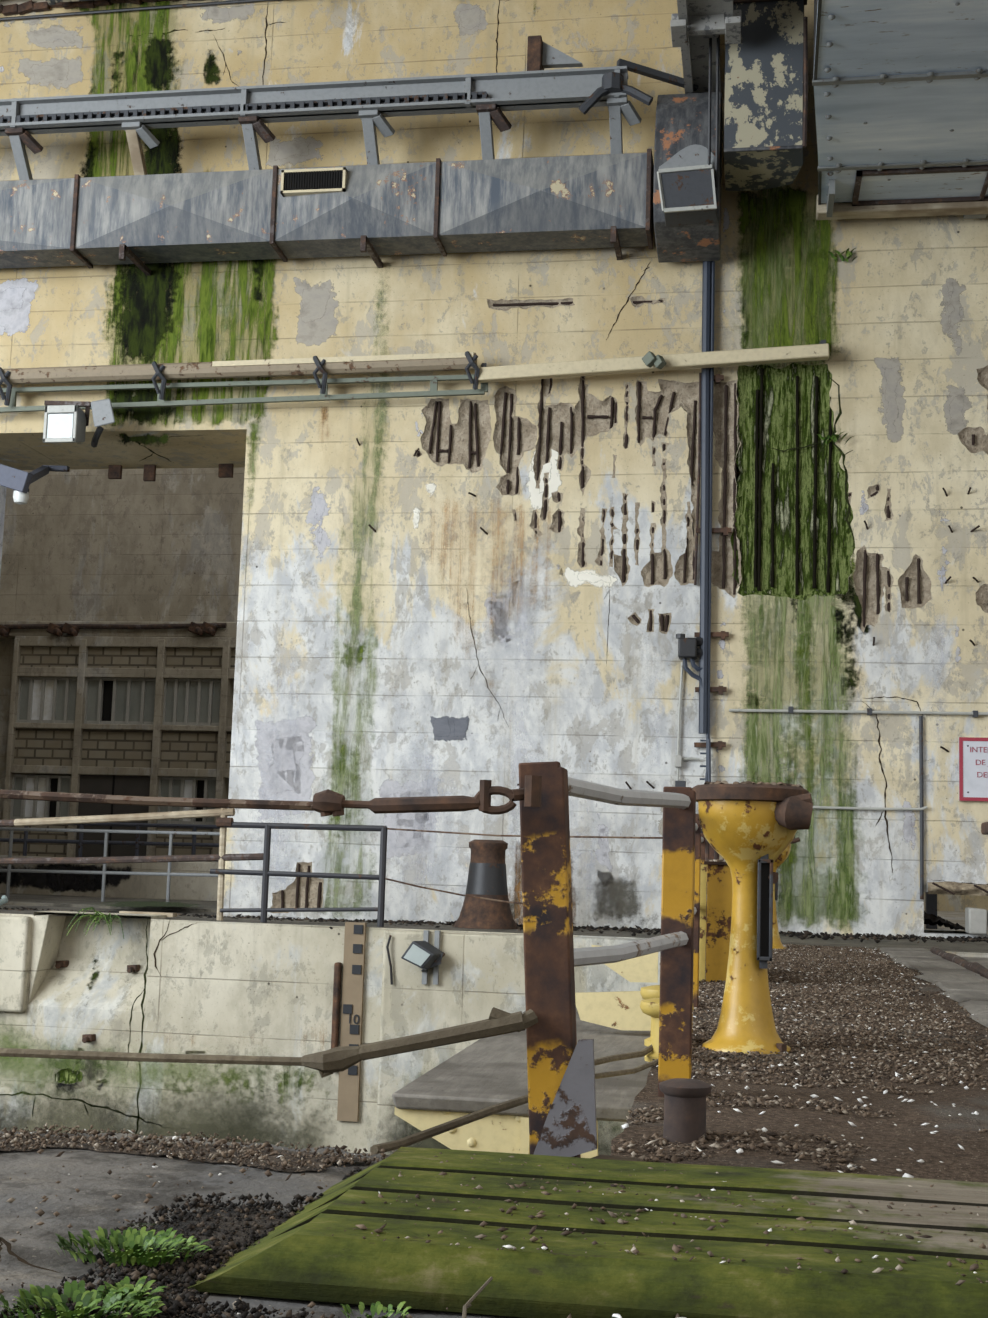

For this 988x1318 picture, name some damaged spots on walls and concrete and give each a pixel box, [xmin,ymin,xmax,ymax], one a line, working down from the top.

water stain [144,1,179,91]
water stain [144,127,183,175]
water stain [112,263,182,363]
water stain [738,188,838,355]
water stain [111,388,185,445]
peeling [943,365,988,454]
spalling [415,357,949,634]
water stain [835,594,870,695]
spalling [975,584,988,613]
rust [509,843,523,925]
water stain [779,794,856,928]
water stain [0,1035,320,1149]